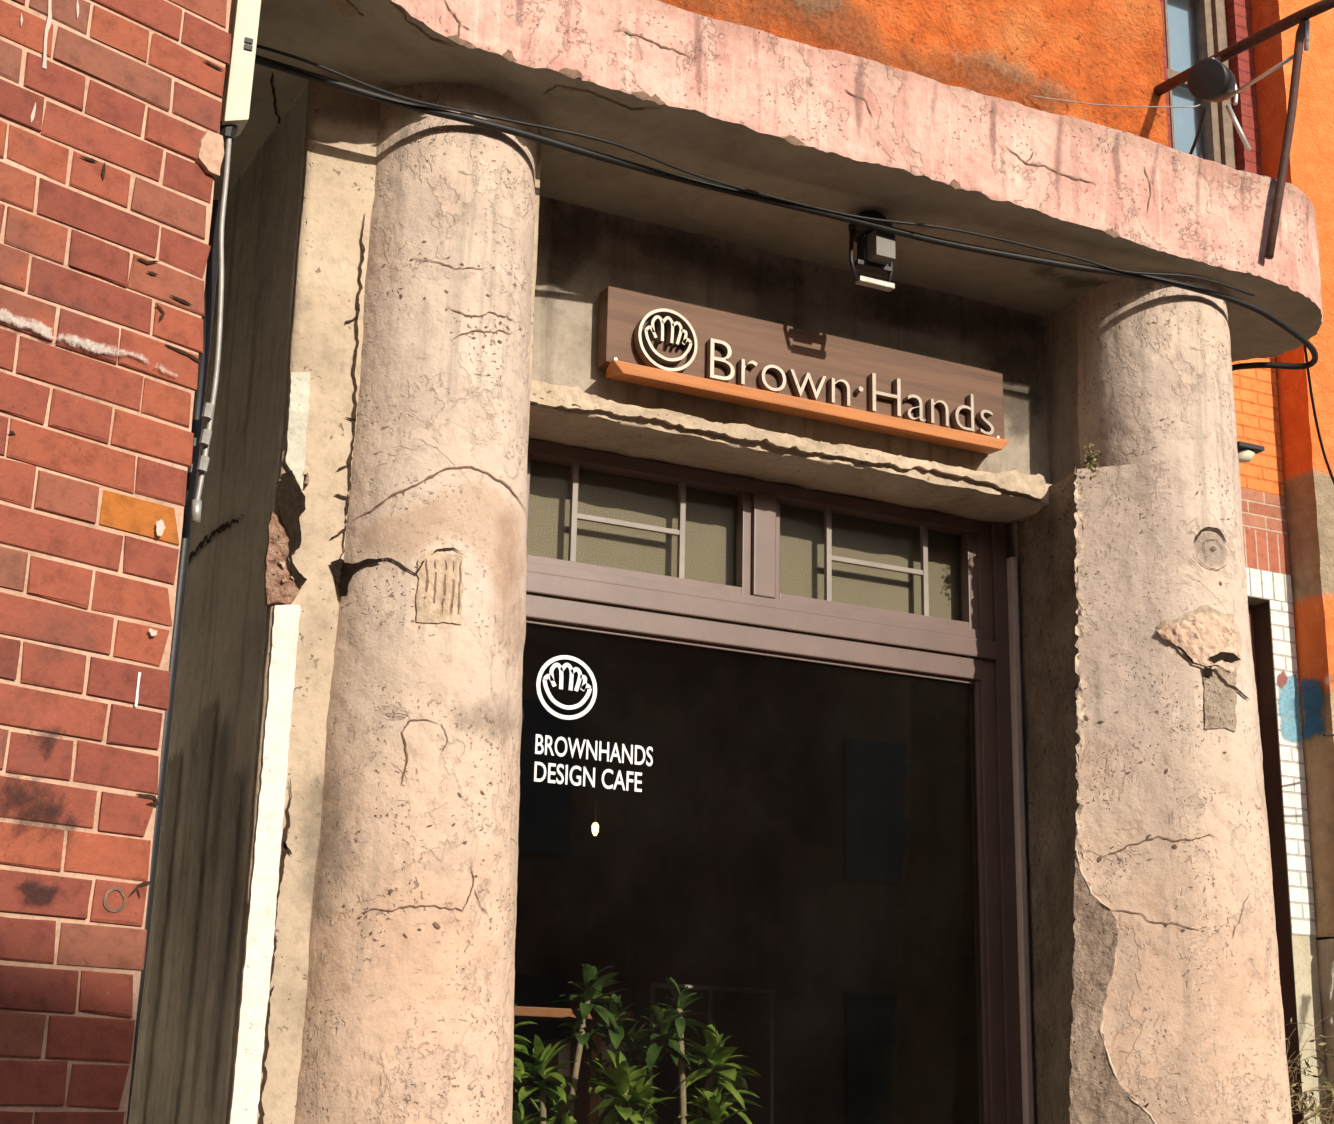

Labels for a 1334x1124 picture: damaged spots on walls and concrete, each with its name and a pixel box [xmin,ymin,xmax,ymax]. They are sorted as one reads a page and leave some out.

leakage [42,0,52,69]
leakage [0,309,177,376]
crack [330,215,527,558]
crack [188,515,244,563]
spalling [330,547,465,625]
spalling [1156,605,1242,732]
peeling [229,470,309,1124]
spalling [1069,466,1157,1124]
crack [1102,834,1218,858]